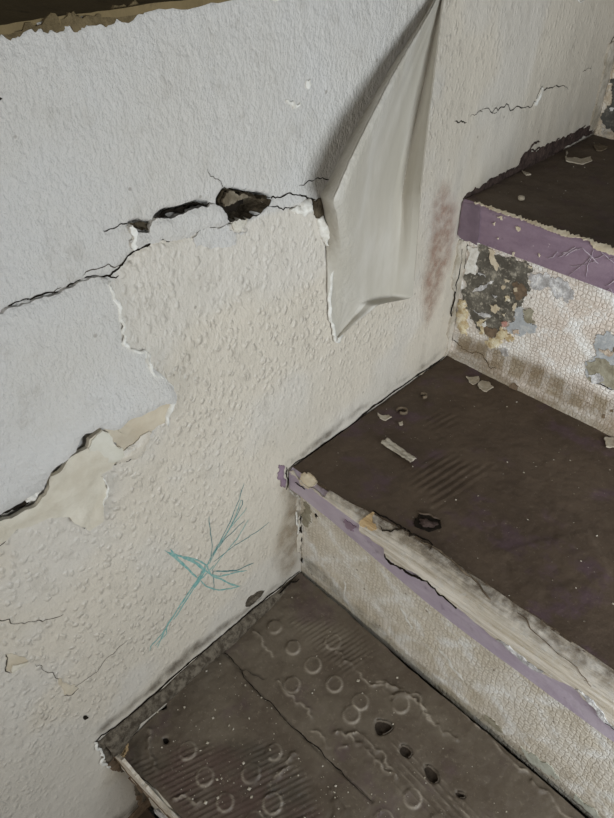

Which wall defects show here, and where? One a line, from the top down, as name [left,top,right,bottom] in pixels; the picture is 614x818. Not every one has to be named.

flaking render [3,0,144,41]
crack [456,85,565,124]
crack [8,239,170,306]
peeling [444,239,520,356]
peeling [0,276,177,546]
peeling [466,376,494,392]
crack [384,554,457,609]
crack [517,612,591,687]